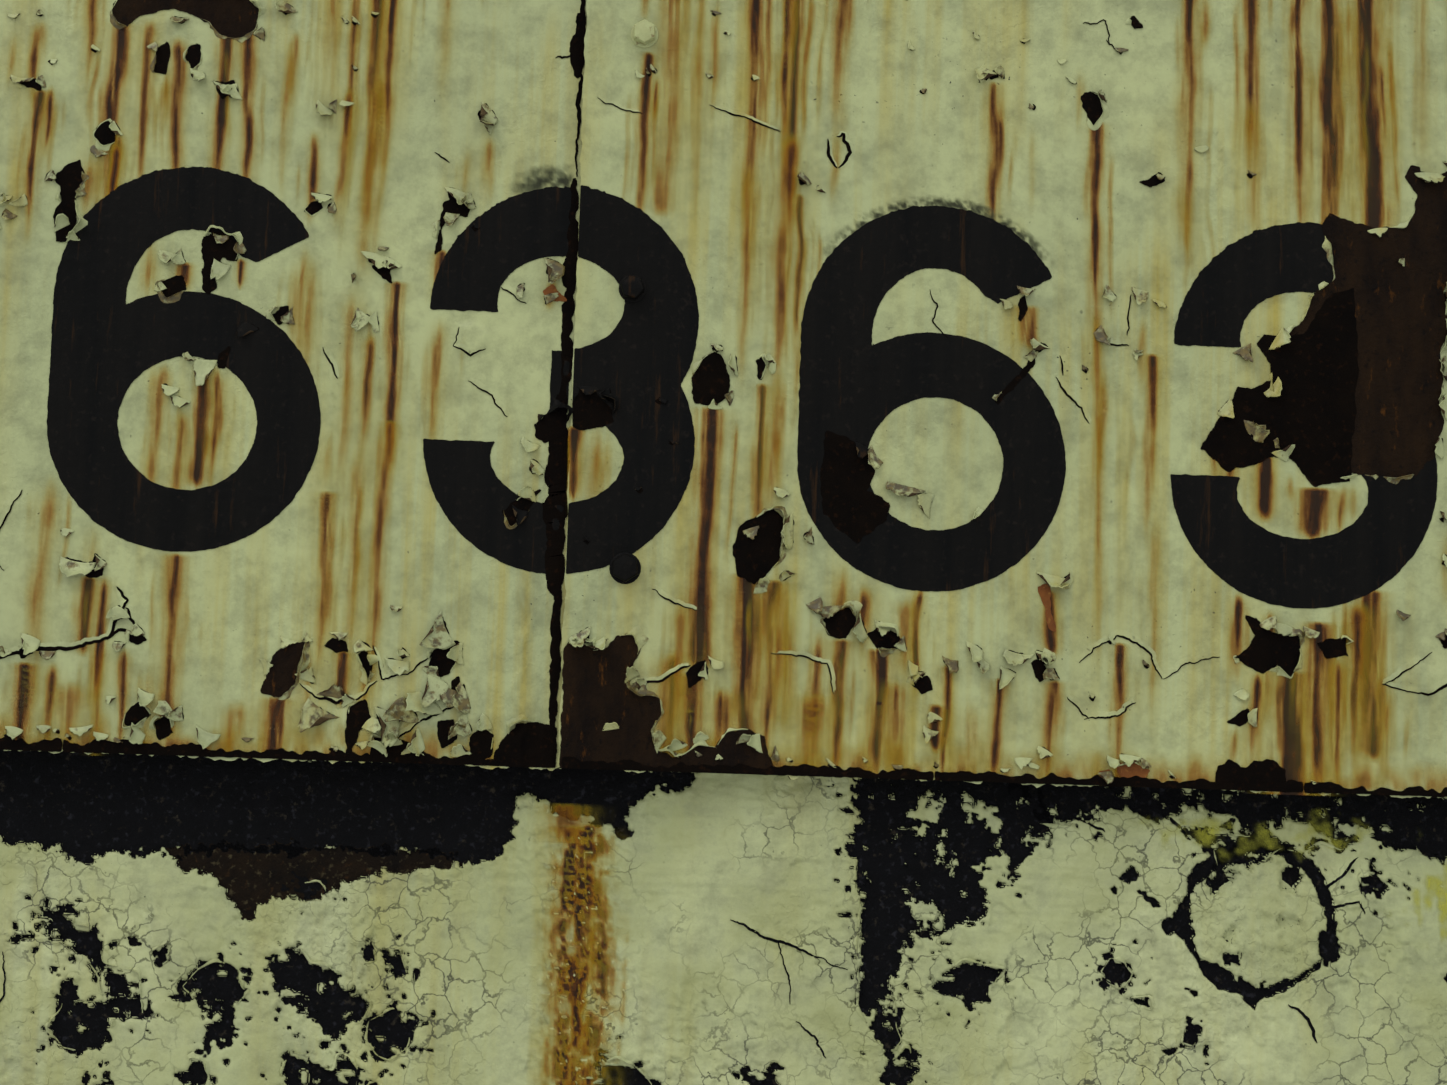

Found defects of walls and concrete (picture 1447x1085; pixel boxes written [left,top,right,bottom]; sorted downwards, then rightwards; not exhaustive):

rust [743,0,852,365]
rust [1290,0,1398,228]
peeling [1200,161,1447,487]
peeling [9,895,436,1085]
peeling [0,605,794,922]
rust [544,805,624,1085]
rust [0,408,1447,797]
peeling [818,746,1447,1085]
crack [1067,629,1220,720]
crack [1161,813,1192,840]
crack [1288,1001,1321,1043]
crack [1318,853,1370,914]